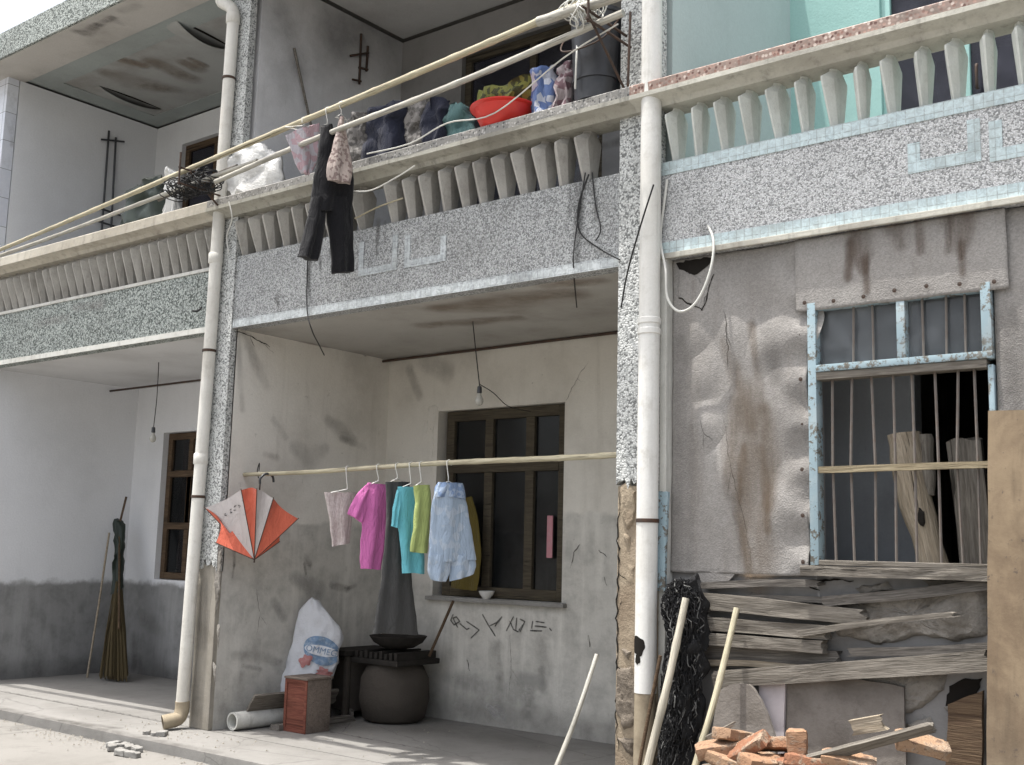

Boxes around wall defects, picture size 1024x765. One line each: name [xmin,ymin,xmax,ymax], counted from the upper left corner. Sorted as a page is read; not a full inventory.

peeling [678,270,708,308]